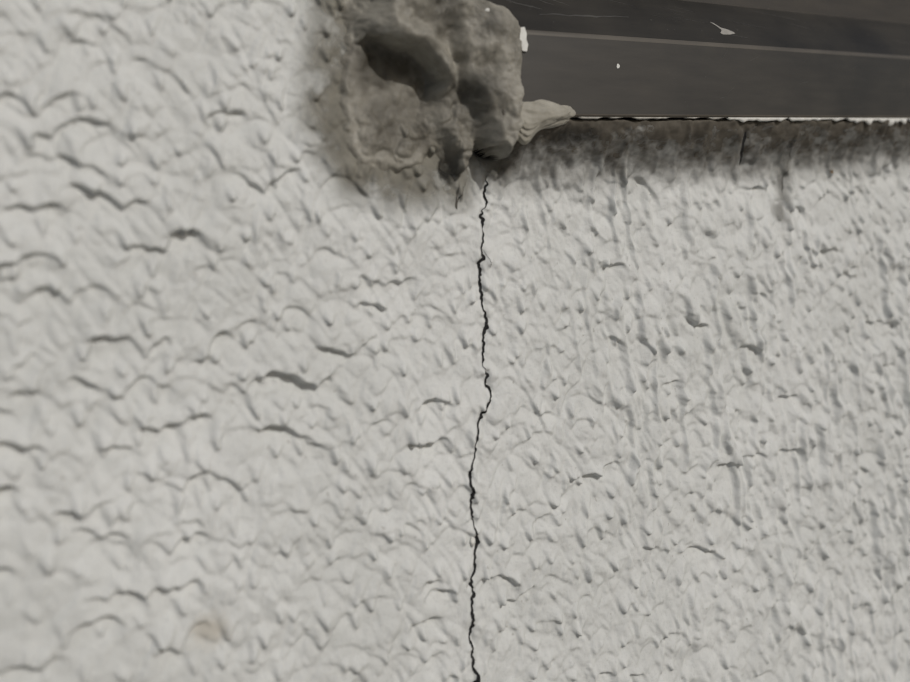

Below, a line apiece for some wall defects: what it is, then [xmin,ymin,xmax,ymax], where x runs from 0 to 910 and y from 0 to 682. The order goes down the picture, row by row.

crack [455,177,492,682]